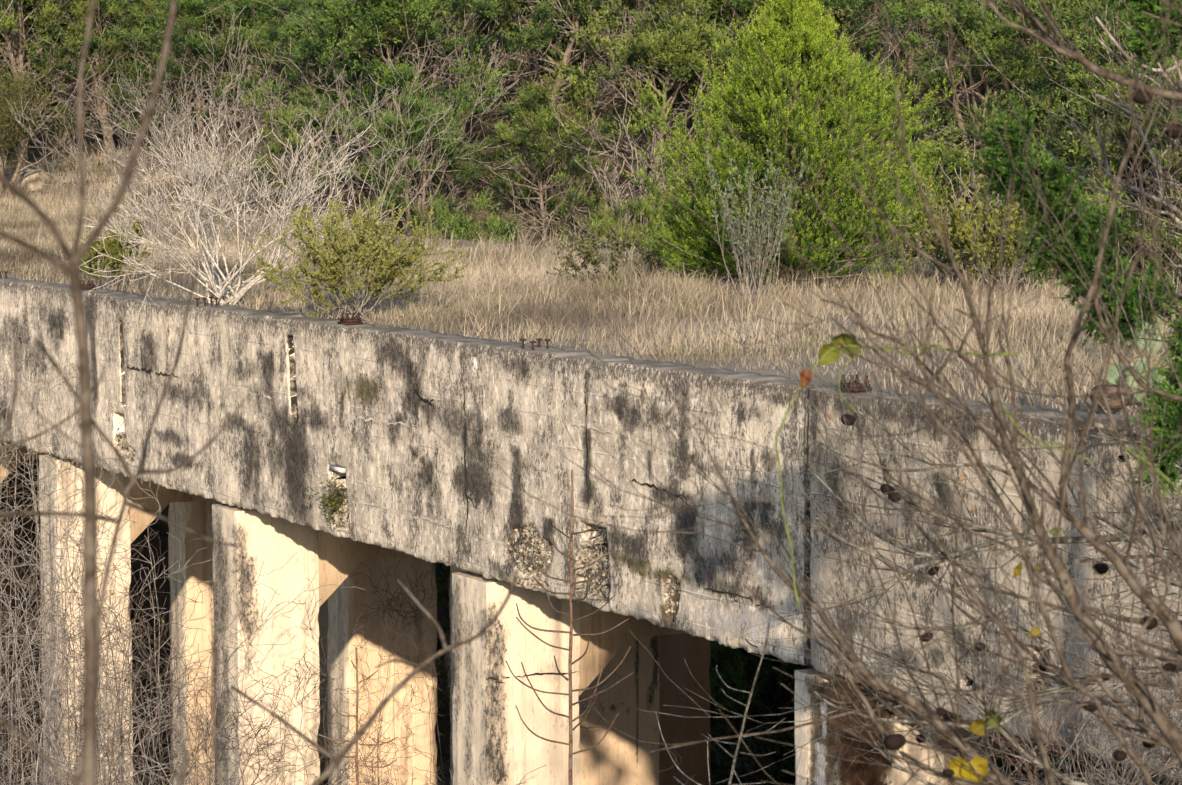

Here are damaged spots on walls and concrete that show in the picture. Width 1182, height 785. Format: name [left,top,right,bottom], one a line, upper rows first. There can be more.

leakage [1,306,72,370]
leakage [84,296,98,412]
leakage [135,314,344,525]
spalling [329,465,350,534]
leakage [377,340,550,580]
spalling [505,523,554,591]
leakage [543,519,554,548]
leakage [580,372,604,518]
leakage [573,527,649,600]
leakage [604,384,790,649]
leakage [208,505,259,784]
leakage [449,577,509,784]